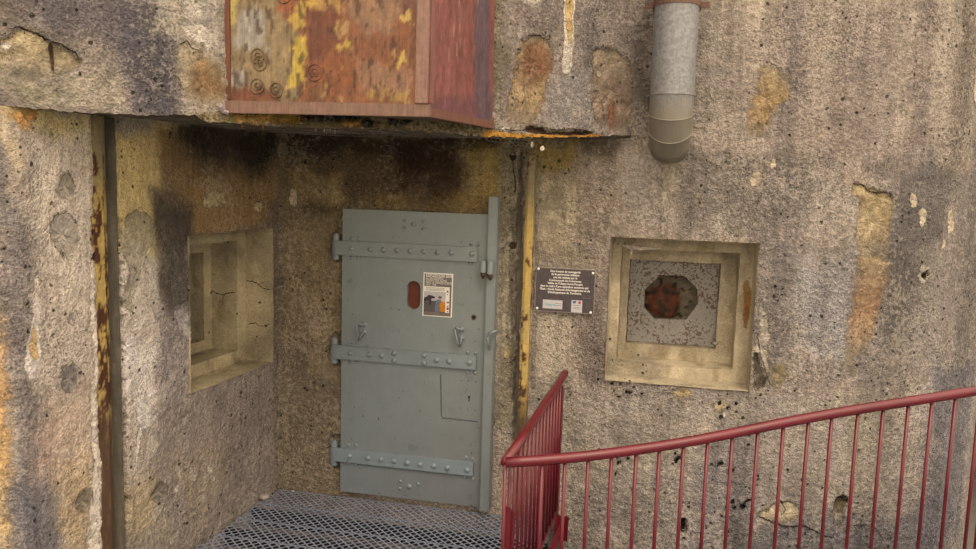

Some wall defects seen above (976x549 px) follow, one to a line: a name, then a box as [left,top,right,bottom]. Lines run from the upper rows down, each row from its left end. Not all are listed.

spalling [0,26,81,75]
spalling [508,34,554,115]
water stain [561,0,575,74]
spalling [590,48,633,123]
spalling [852,183,893,249]
spalling [759,495,848,538]